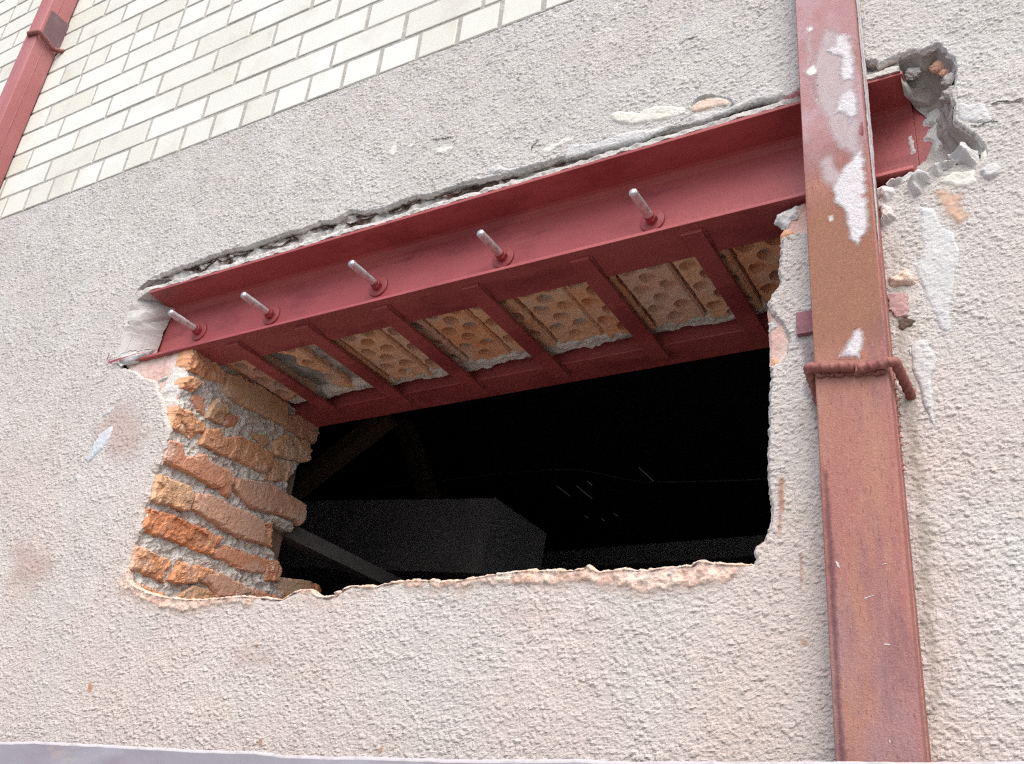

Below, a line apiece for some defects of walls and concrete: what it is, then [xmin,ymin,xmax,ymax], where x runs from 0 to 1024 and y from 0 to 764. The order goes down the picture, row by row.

corrosion [796,0,866,166]
spalling [866,49,987,172]
crack [531,141,599,168]
flaking render [941,170,977,189]
crack [165,177,515,278]
corrosion [808,207,882,330]
spalling [767,308,789,367]
spalling [119,349,193,394]
spalling [119,560,753,612]